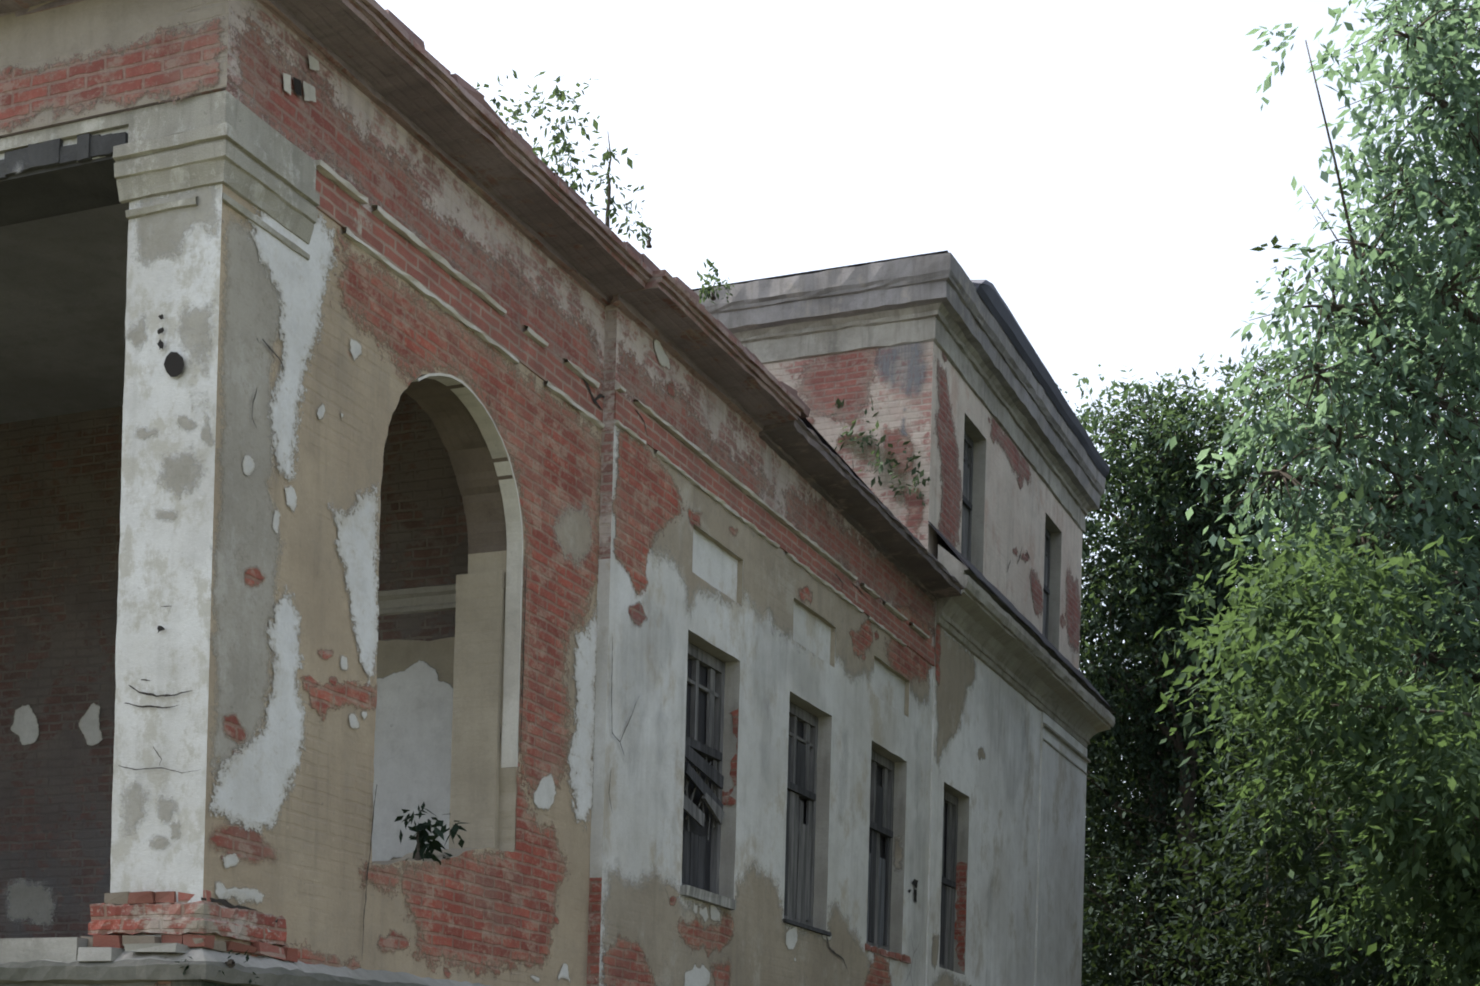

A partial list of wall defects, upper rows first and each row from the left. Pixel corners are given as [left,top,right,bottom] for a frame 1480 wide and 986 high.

flaking render [0,7,780,504]
flaking render [988,417,1031,488]
flaking render [121,185,976,986]
flaking render [1013,547,1044,616]
flaking render [1060,569,1081,657]